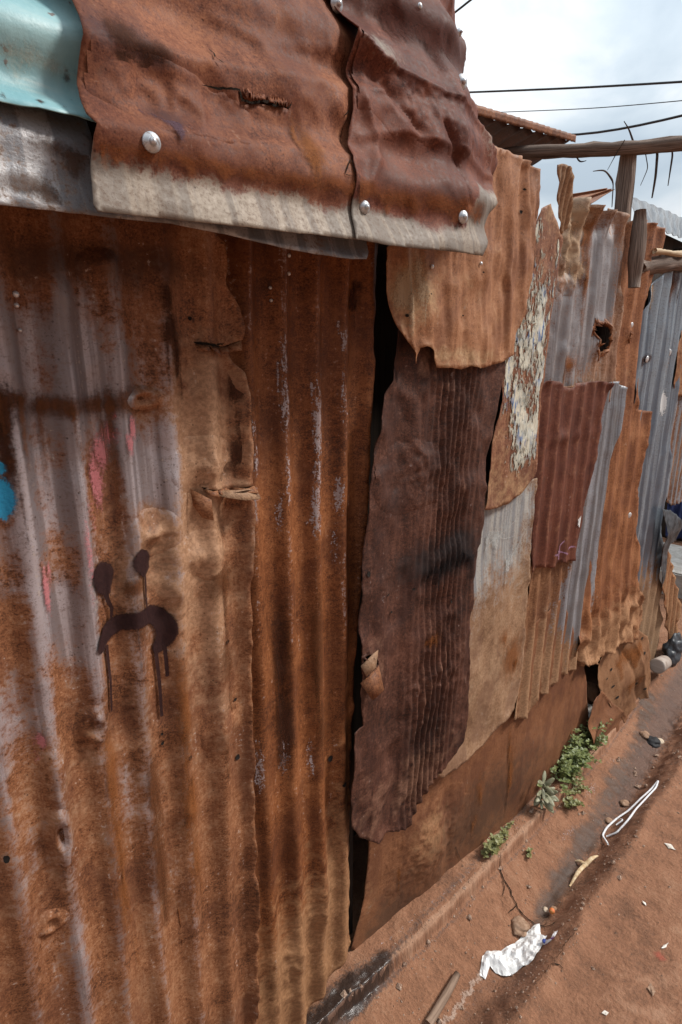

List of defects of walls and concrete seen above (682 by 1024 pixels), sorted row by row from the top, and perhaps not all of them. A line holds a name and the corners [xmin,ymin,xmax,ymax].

rust [105,19,170,68]
crack [203,85,292,108]
rust [362,0,452,68]
rust [100,129,482,221]
rust [161,285,183,395]
peeling [500,204,590,477]
rust [0,384,143,519]
rust [223,415,244,477]
rust [273,611,296,768]
rust [176,666,200,876]
rust [148,764,168,912]